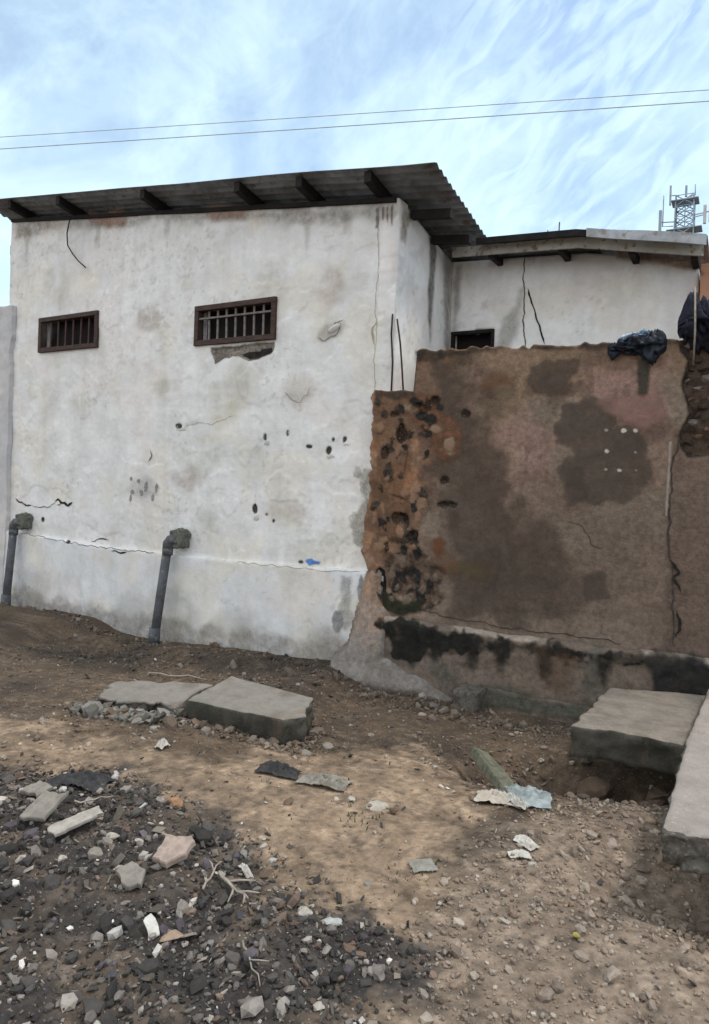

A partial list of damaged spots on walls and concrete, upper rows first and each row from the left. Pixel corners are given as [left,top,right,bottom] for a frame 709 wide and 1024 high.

crack [16,498,72,508]
crack [24,533,153,554]
spalling [211,342,274,364]
crack [371,209,379,388]
spalling [350,394,471,610]
damp [428,244,450,326]
damp [415,341,609,620]
crack [522,256,545,346]
damp [527,343,652,504]
crack [665,440,682,646]
spalling [679,339,709,457]
damp [374,586,709,695]